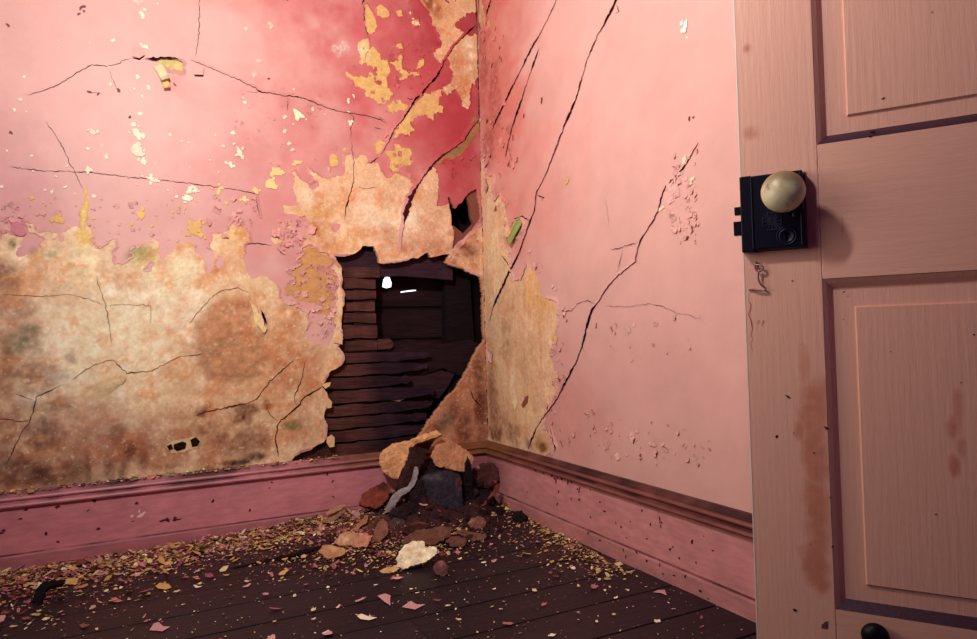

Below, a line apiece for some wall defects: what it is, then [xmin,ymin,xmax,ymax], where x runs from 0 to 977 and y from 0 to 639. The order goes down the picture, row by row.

crack [5,280,202,466]
crack [194,361,323,455]
crack [10,0,556,251]
flaking render [0,0,710,494]
crack [470,0,619,421]
crack [528,141,701,457]